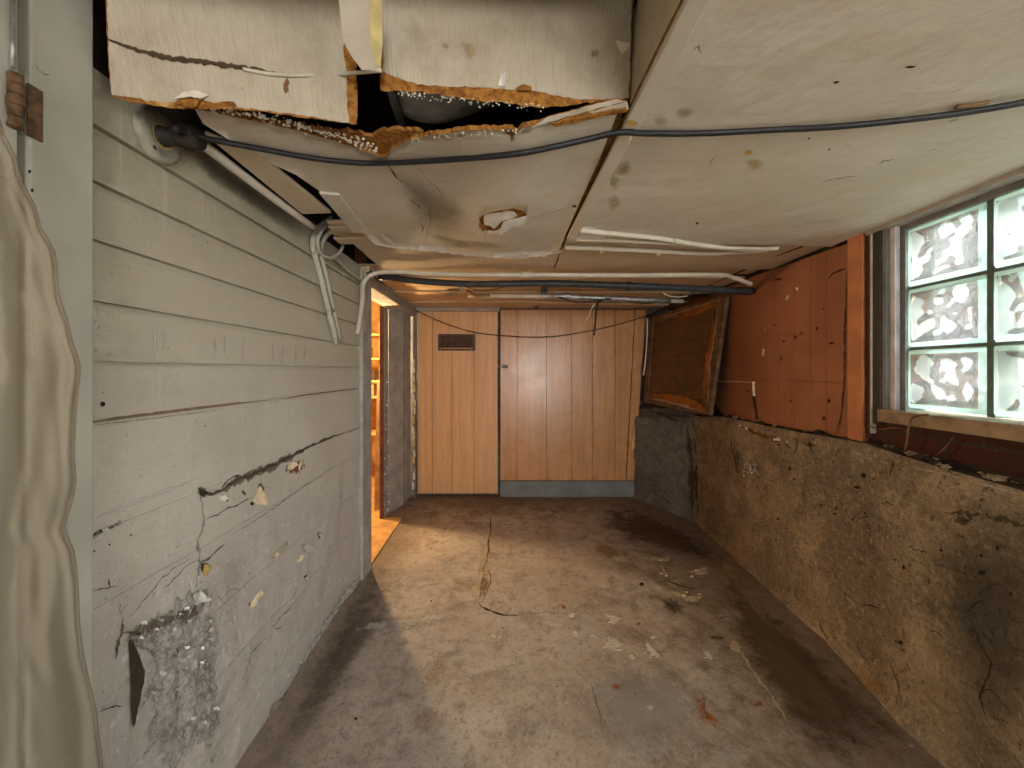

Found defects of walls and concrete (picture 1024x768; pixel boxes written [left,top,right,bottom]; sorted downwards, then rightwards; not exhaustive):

crack [107,38,274,72]
crack [98,427,361,622]
crack [470,518,568,616]
spalling [115,559,220,768]
crack [966,599,1009,729]